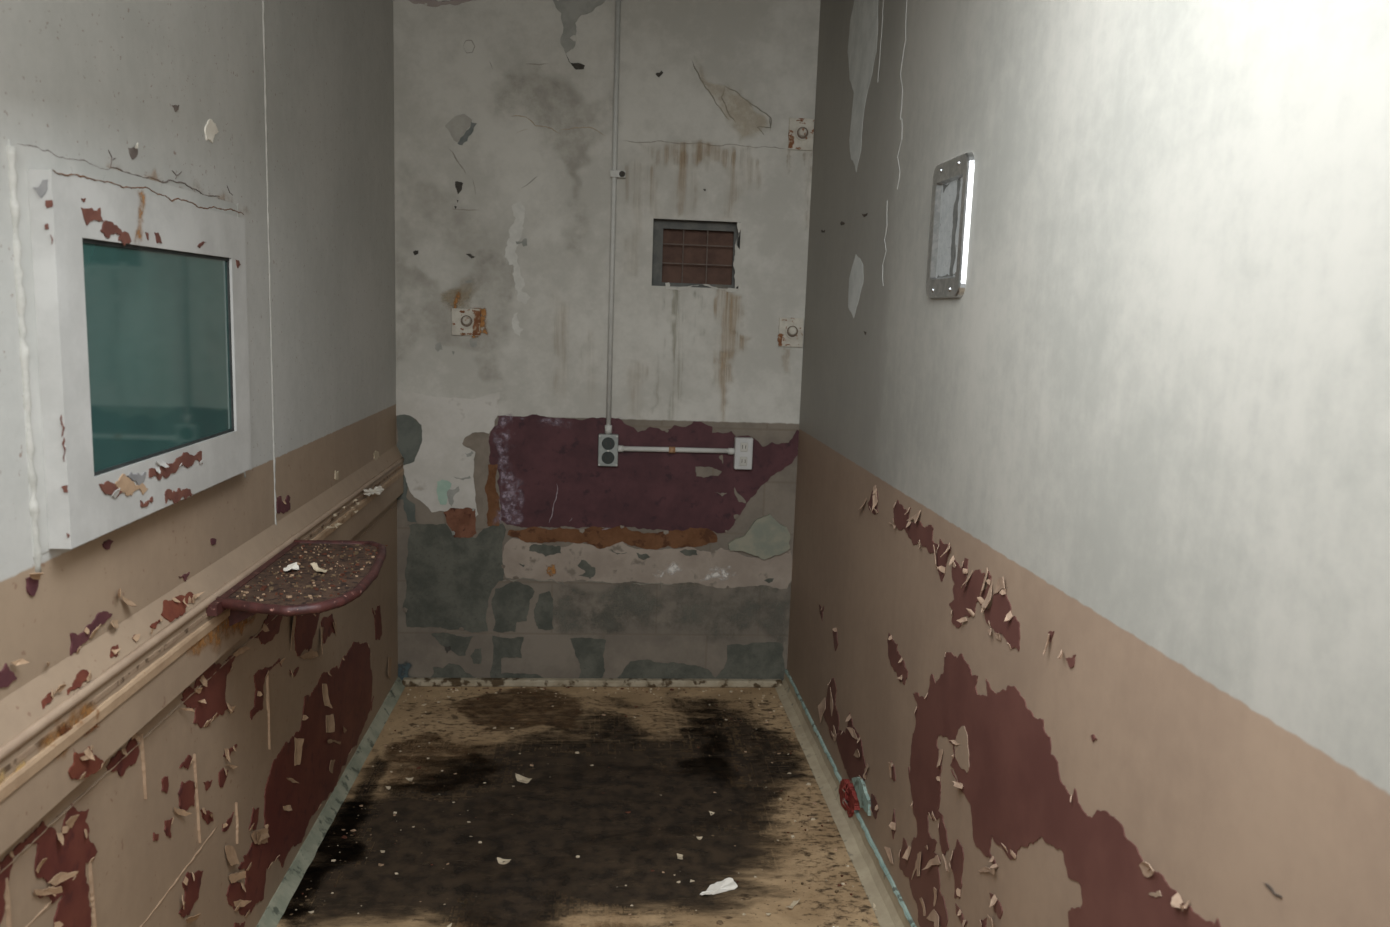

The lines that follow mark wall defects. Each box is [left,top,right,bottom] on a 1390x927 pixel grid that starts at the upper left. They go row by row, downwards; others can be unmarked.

peeling [81,198,162,246]
crack [20,144,244,215]
corrosion [443,289,488,338]
peeling [99,451,203,507]
peeling [444,414,799,580]
peeling [858,485,1020,651]
peeling [41,572,204,709]
peeling [0,804,98,927]
peeling [68,733,140,780]
peeling [153,605,392,927]
leakage [281,688,876,927]
peeling [818,631,1221,927]